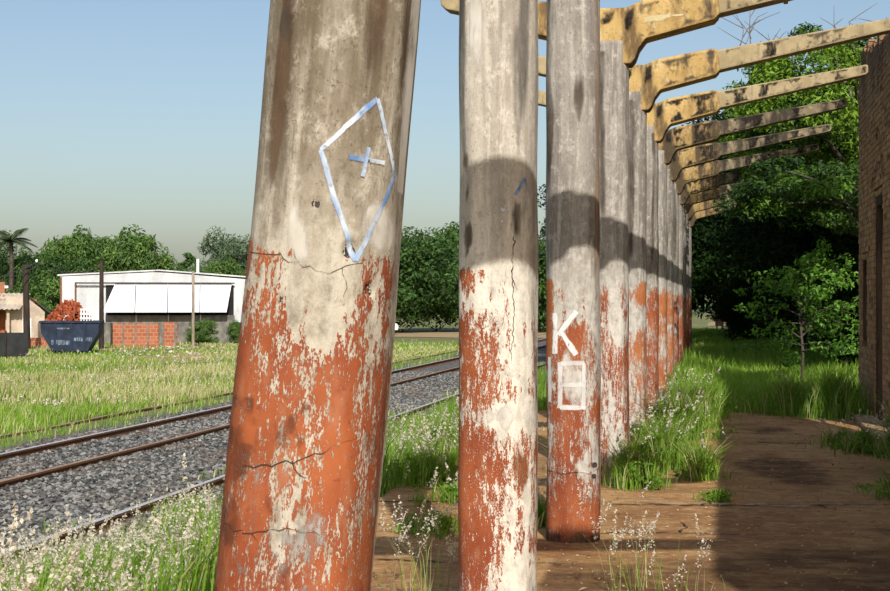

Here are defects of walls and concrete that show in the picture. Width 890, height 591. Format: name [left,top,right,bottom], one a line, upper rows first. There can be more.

leakage [369,0,385,60]
peeling [470,0,482,67]
leakage [625,9,642,30]
leakage [764,42,779,56]
leakage [271,0,293,177]
leakage [725,88,748,105]
leakage [657,93,725,256]
crack [250,251,310,268]
crack [509,237,517,360]
peeling [214,204,395,591]
peeling [458,267,692,591]
crack [245,451,326,478]